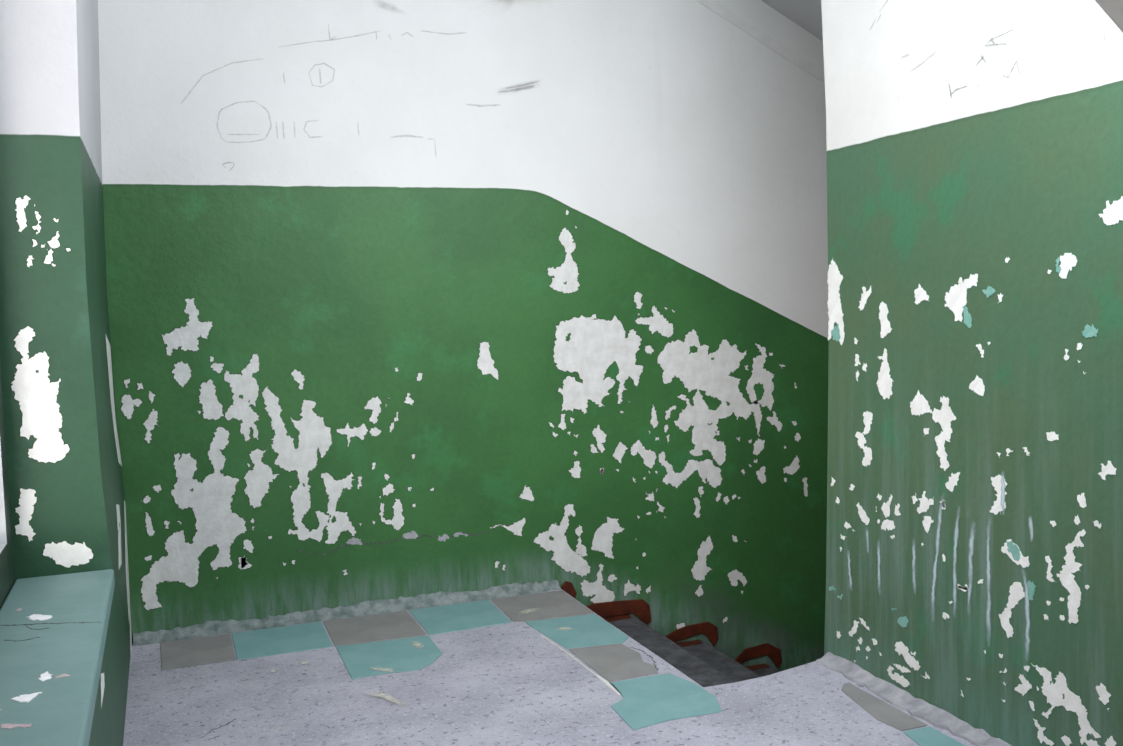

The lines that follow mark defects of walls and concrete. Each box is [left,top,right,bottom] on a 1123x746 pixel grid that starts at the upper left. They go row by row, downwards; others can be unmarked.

peeling [10,325,71,464]
peeling [14,195,72,268]
peeling [14,488,94,569]
peeling [116,297,423,658]
peeling [547,210,580,294]
peeling [489,503,651,603]
peeling [548,291,808,519]
peeling [827,258,894,400]
peeling [830,389,961,552]
peeling [944,273,1004,328]
peeling [998,492,1102,638]
peeling [983,649,1117,746]